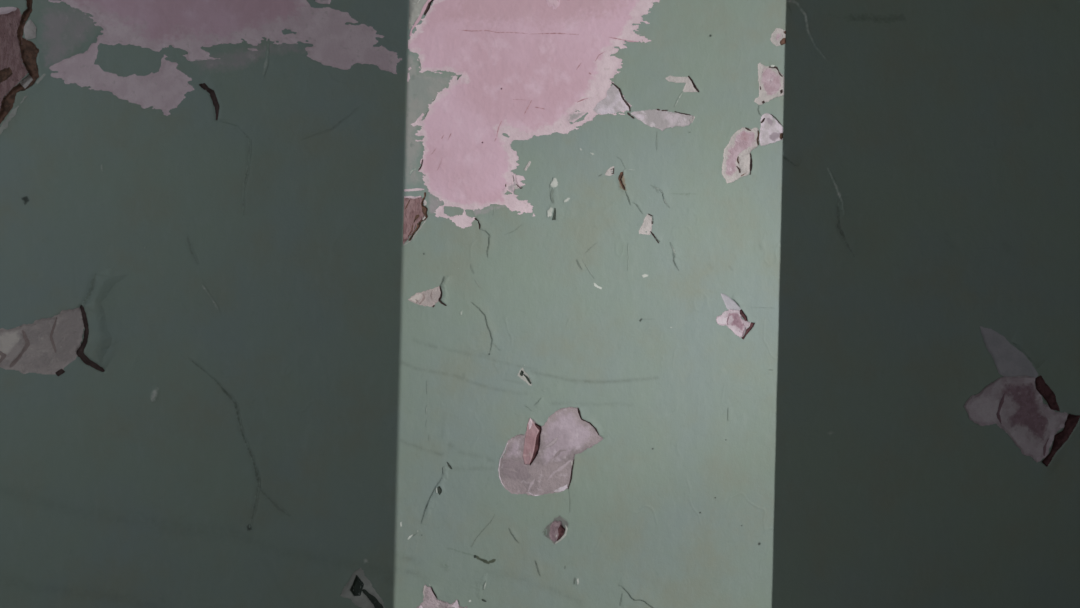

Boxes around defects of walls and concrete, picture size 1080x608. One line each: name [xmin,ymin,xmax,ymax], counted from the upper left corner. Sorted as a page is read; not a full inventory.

peeling [0,0,699,246]
peeling [722,63,785,183]
peeling [0,268,127,376]
peeling [408,275,453,307]
peeling [716,293,755,339]
peeling [964,326,1080,466]
peeling [498,407,605,545]
flaking render [340,557,385,608]
flaking render [416,583,471,608]